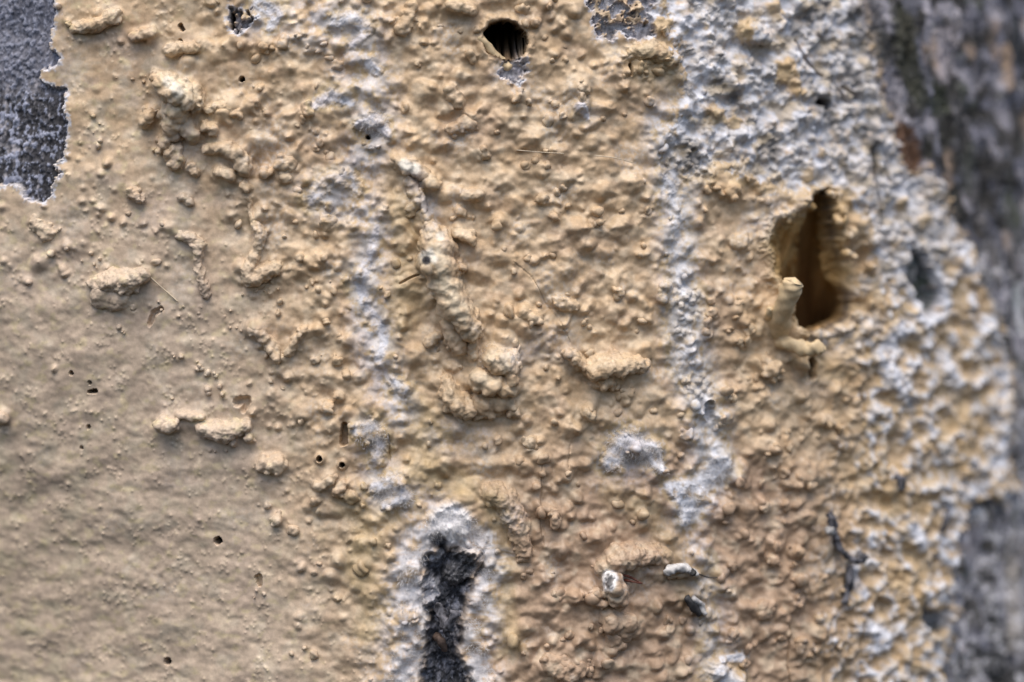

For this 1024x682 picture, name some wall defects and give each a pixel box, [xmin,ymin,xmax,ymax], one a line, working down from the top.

peeling [586,0,661,41]
peeling [0,0,68,203]
spalling [769,192,853,333]
peeling [441,547,484,586]